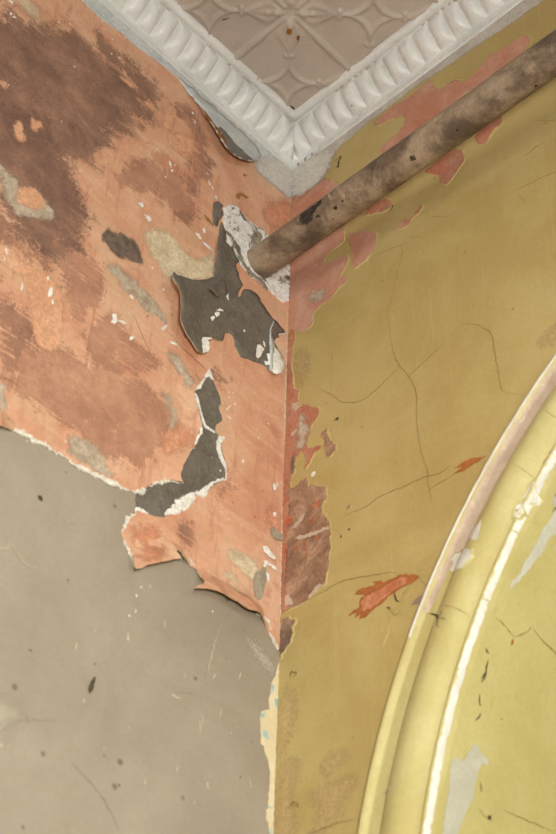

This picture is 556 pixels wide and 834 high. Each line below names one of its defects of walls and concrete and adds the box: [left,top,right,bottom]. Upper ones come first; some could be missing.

damp [0,2,219,476]
peeling [425,148,467,186]
peeling [375,33,533,155]
flaking render [0,0,379,834]
crack [325,339,451,515]
peeling [408,354,556,637]
crack [460,322,514,394]
peeling [348,574,419,619]
peeling [423,450,556,834]
crack [496,618,556,654]